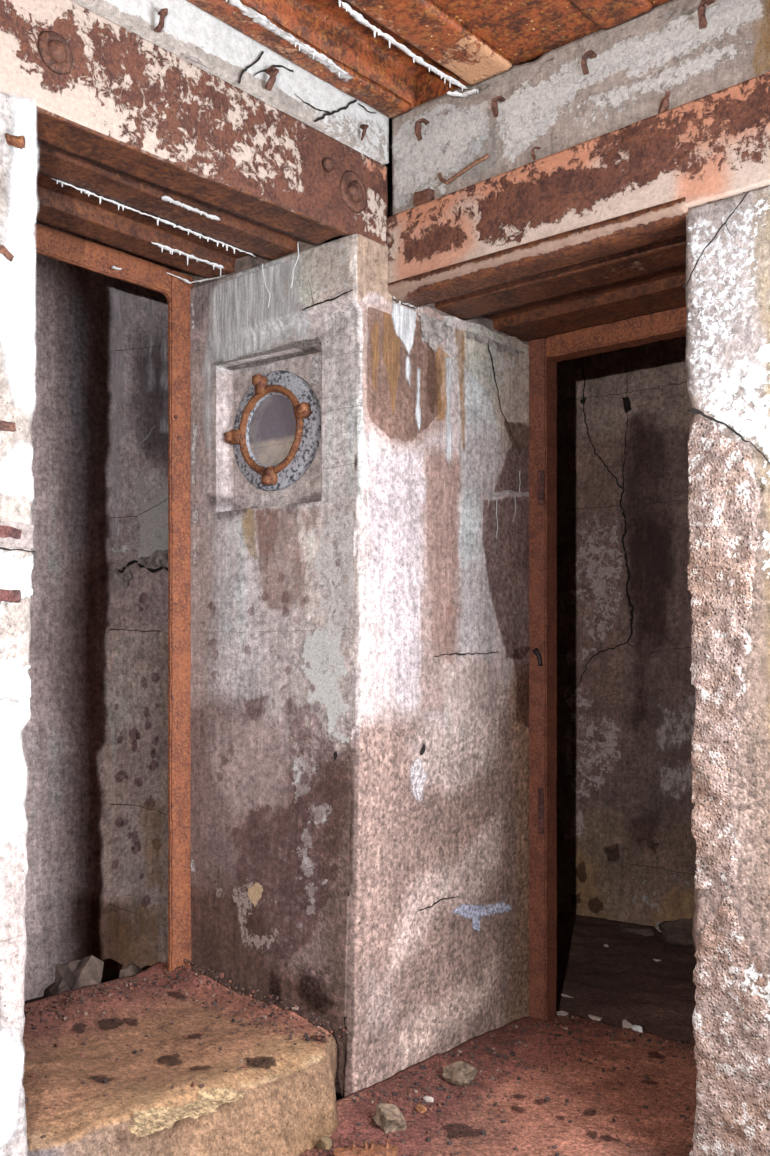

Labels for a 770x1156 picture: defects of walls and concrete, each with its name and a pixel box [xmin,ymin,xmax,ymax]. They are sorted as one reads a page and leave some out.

crack [238,51,376,122]
leakage [0,96,38,414]
leakage [51,178,310,484]
leakage [391,296,426,429]
crack [465,344,527,538]
peeling [0,549,34,606]
crack [0,545,35,553]
crack [108,560,168,575]
crack [562,366,770,702]
peeling [0,645,31,701]
spalling [687,197,770,1156]
leakage [656,695,696,798]